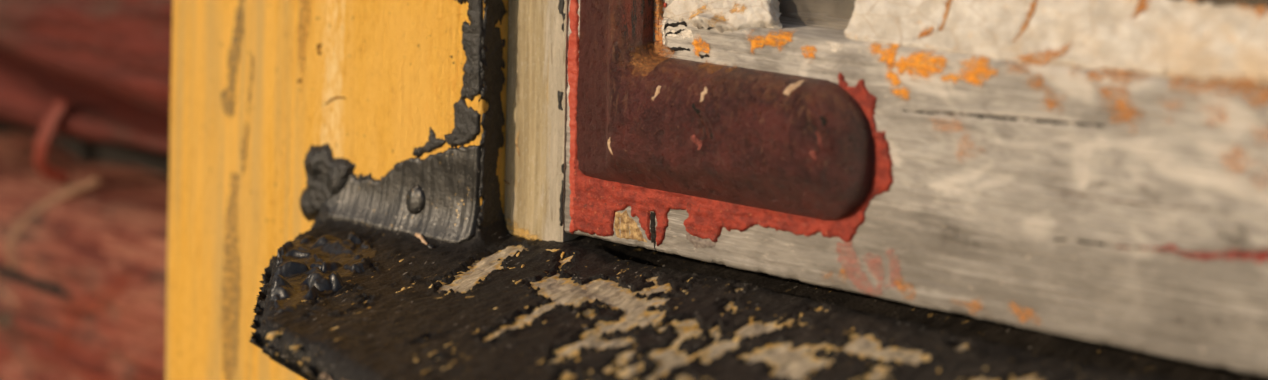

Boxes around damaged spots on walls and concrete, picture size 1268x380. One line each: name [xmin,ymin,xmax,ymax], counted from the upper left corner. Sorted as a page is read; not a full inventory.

rust [688,4,746,23]
rust [630,0,674,76]
rust [692,39,735,73]
rust [749,32,817,59]
peeling [300,143,372,221]
peeling [412,0,941,380]
crack [1055,238,1195,254]